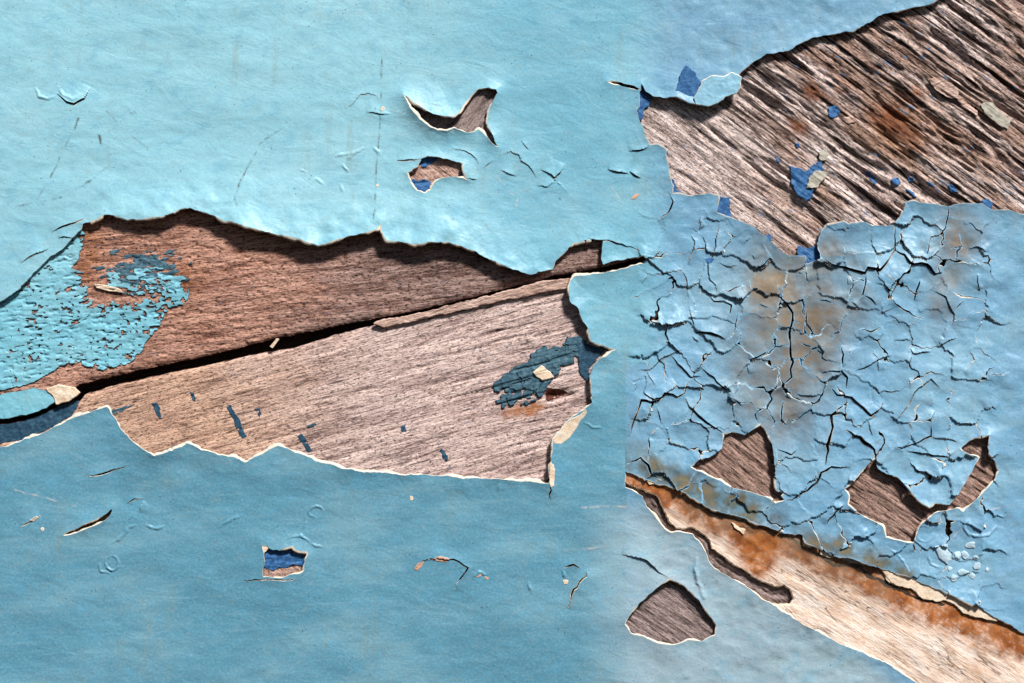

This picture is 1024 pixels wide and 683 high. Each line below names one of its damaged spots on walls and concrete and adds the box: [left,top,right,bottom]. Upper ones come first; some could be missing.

peeling [407,156,475,193]
peeling [404,87,498,147]
crack [453,141,561,187]
peeling [608,0,1024,264]
peeling [0,208,645,487]
crack [0,194,1007,607]
peeling [257,545,308,580]
peeling [625,417,1024,683]
corrosion [625,472,1024,660]